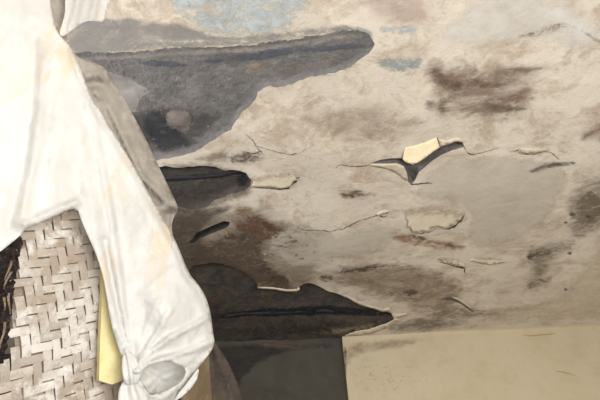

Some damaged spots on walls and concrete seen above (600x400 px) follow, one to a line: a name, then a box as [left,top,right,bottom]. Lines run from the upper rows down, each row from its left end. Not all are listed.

leakage [430,67,531,116]
spalling [75,30,375,210]
peeling [350,137,491,185]
spalling [188,221,230,243]
corrosion [236,208,285,240]
crack [301,210,390,232]
peeling [405,207,464,234]
leakage [570,182,600,236]
spalling [188,263,408,342]
crack [442,297,473,312]